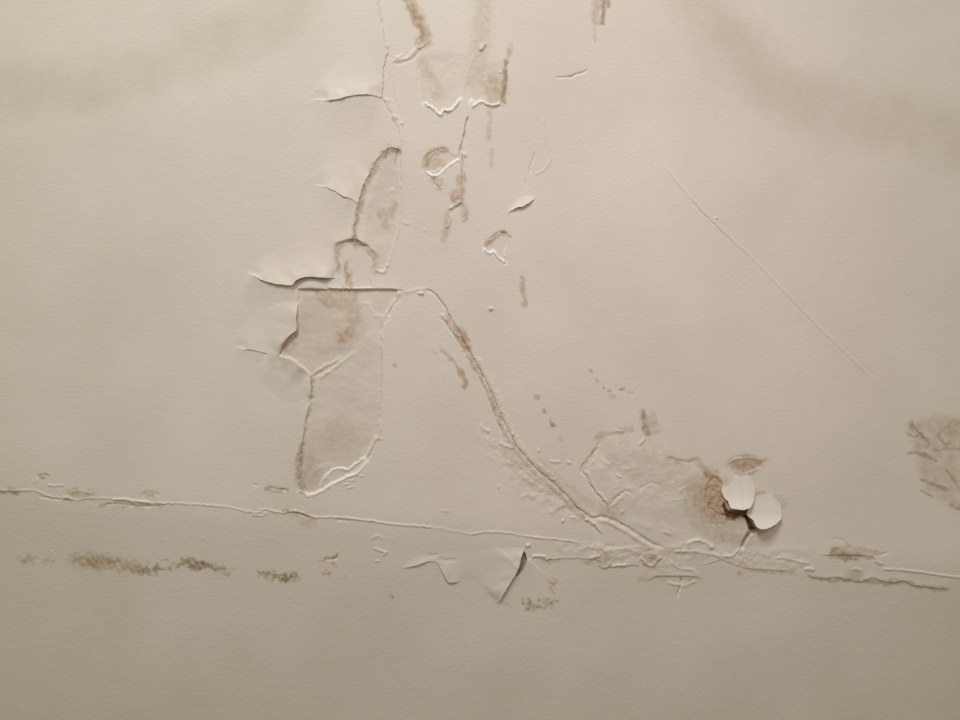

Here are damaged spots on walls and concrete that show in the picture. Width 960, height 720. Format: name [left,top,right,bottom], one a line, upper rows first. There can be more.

peeling [235,0,430,499]
crack [0,285,669,564]
spalling [400,453,948,611]
crack [742,541,819,573]
crack [878,567,960,580]